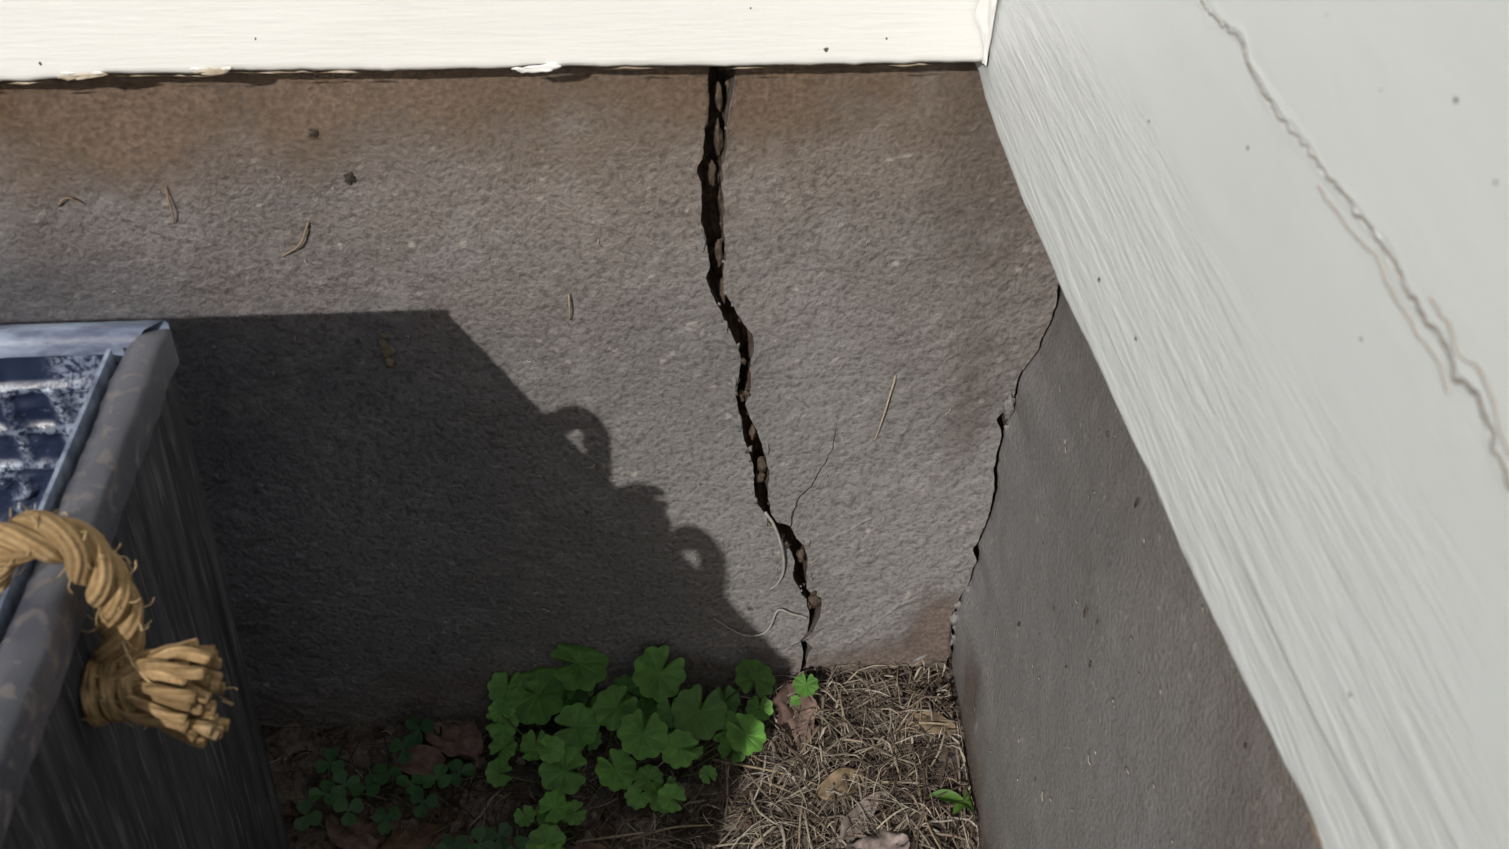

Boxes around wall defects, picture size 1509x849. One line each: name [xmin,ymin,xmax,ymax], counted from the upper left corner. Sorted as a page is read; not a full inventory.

crack [697,66,836,662]
crack [1194,0,1509,496]